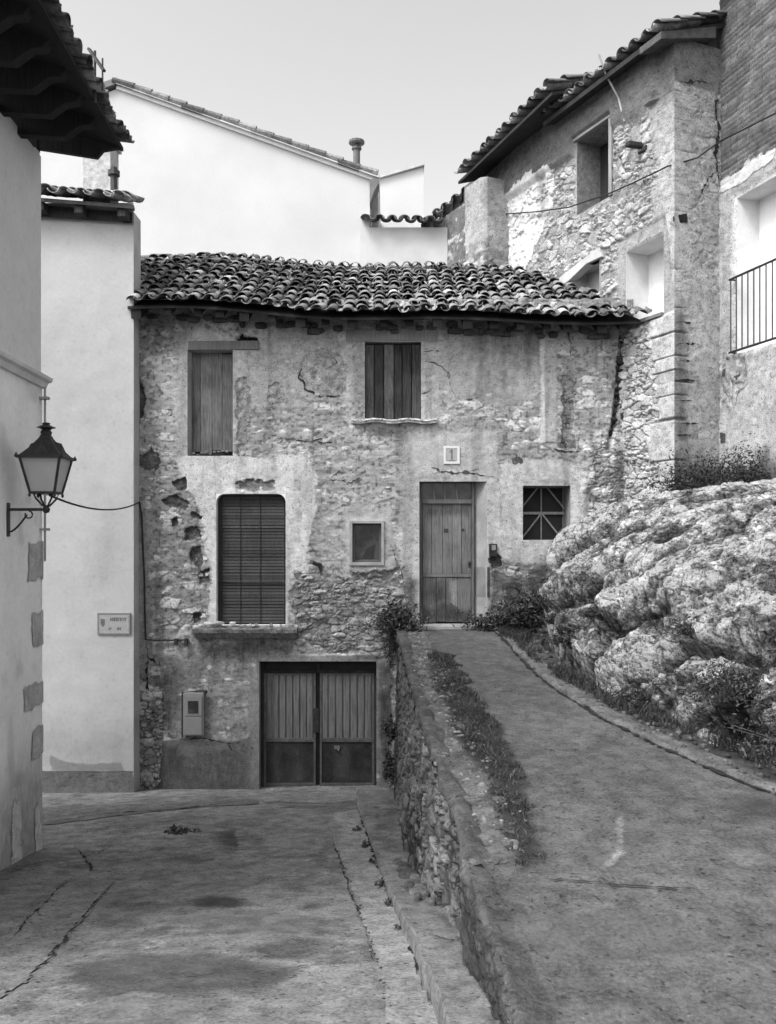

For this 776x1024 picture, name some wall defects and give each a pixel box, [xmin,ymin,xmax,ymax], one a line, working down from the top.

crack [680,79,721,199]
crack [609,332,625,436]
flaking render [139,449,163,472]
flaking render [161,477,210,583]